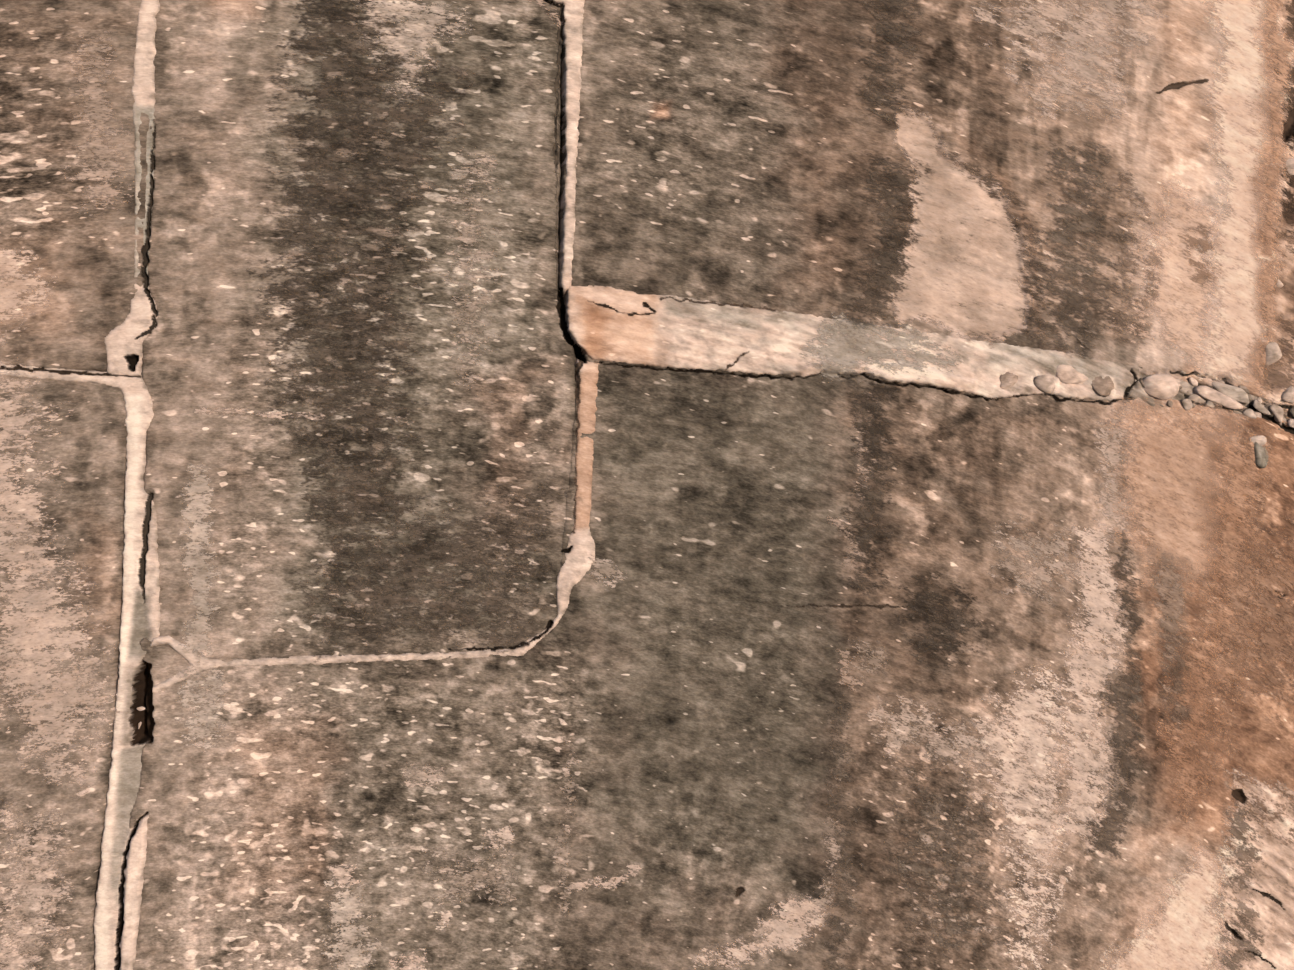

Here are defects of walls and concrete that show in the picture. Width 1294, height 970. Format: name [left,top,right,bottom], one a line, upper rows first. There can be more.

crack [0,364,141,377]
crack [134,122,158,340]
leakage [194,0,572,662]
crack [543,0,1139,533]
crack [1170,371,1294,434]
crack [138,493,153,603]
crack [448,620,554,651]
leakage [827,373,984,670]
leakage [867,407,1145,970]
crack [114,811,148,970]